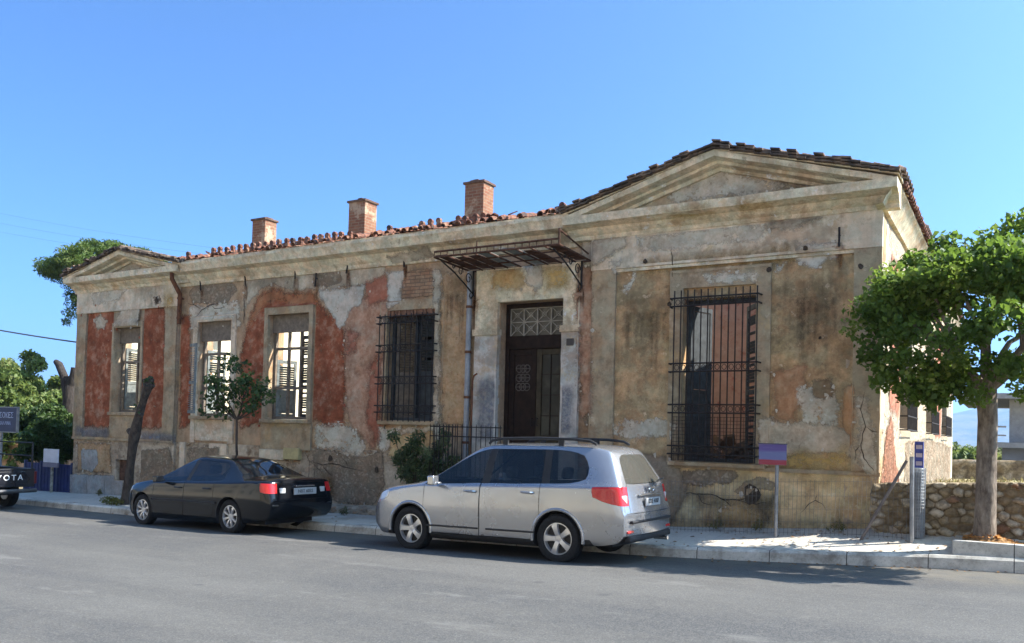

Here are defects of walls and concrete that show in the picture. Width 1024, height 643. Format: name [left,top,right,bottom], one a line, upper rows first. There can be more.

peeling [81,295,165,429]
peeling [178,267,443,505]
peeling [757,378,950,483]
crack [855,392,880,480]